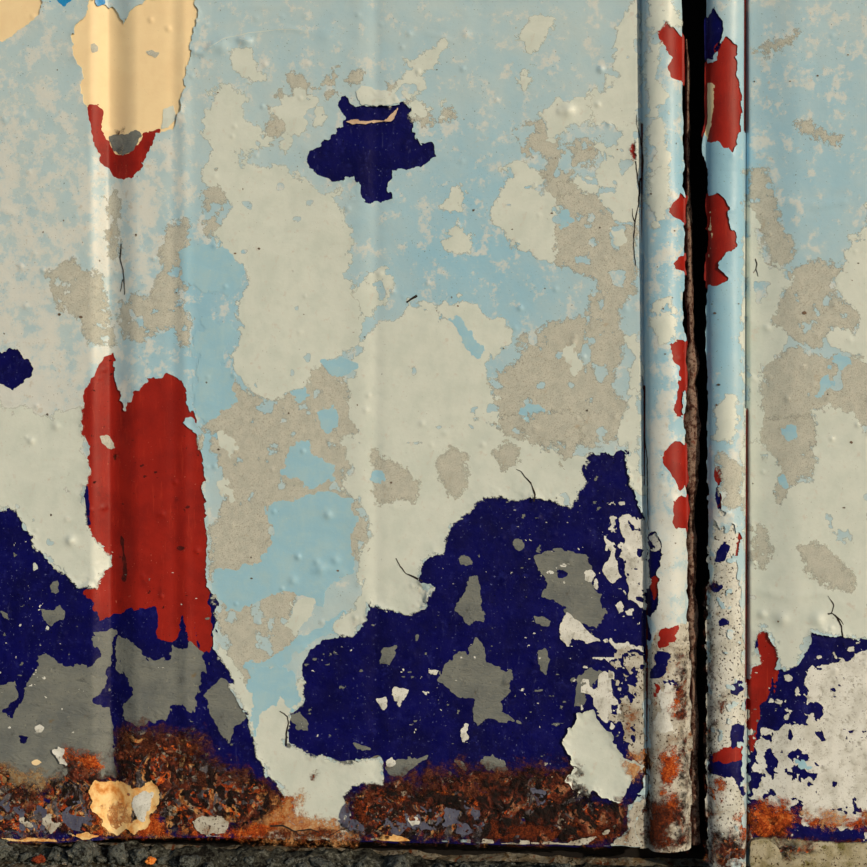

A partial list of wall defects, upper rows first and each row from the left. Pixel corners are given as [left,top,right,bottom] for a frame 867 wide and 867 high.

peeling [71,0,198,260]
peeling [262,65,458,204]
peeling [701,7,743,152]
peeling [704,193,738,289]
peeling [740,167,867,507]
peeling [0,118,693,853]
corrosion [674,654,688,720]
peeling [705,451,867,867]
corrosion [0,717,631,848]
corrosion [620,749,654,784]
corrosion [641,731,693,850]
corrosion [705,792,867,866]